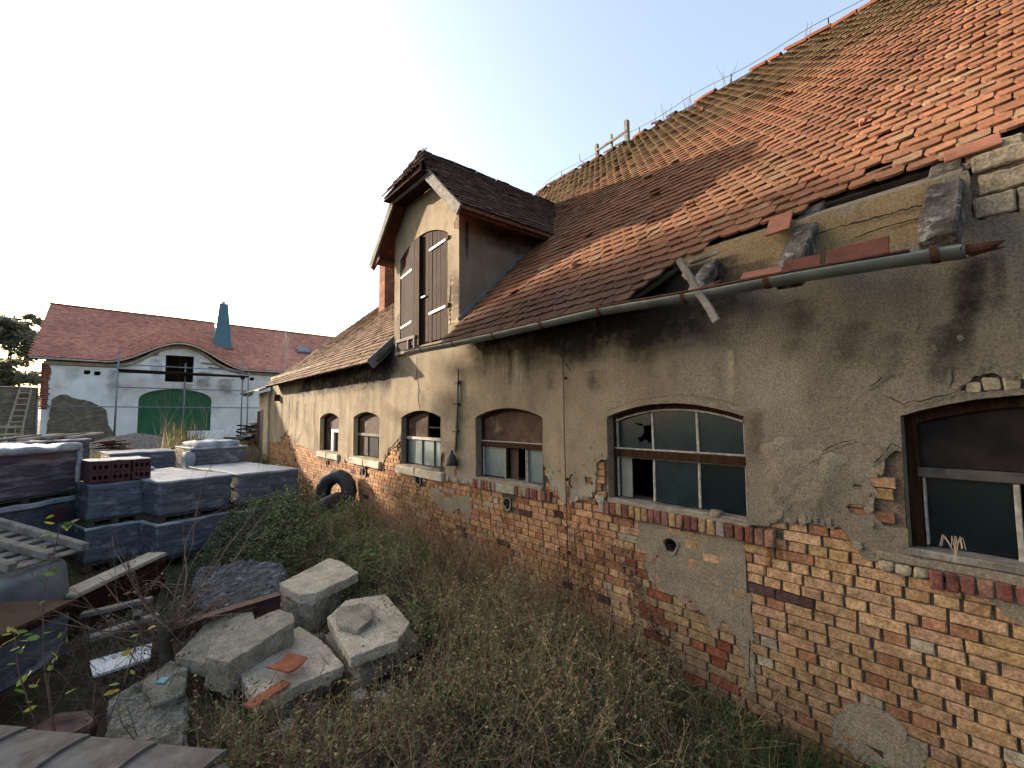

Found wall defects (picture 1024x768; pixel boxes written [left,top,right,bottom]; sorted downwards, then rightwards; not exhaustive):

crack [818,205,922,243]
water stain [472,264,736,392]
water stain [942,259,985,350]
flaking render [952,368,1024,392]
flaking render [569,441,607,504]
flaking render [844,446,897,528]